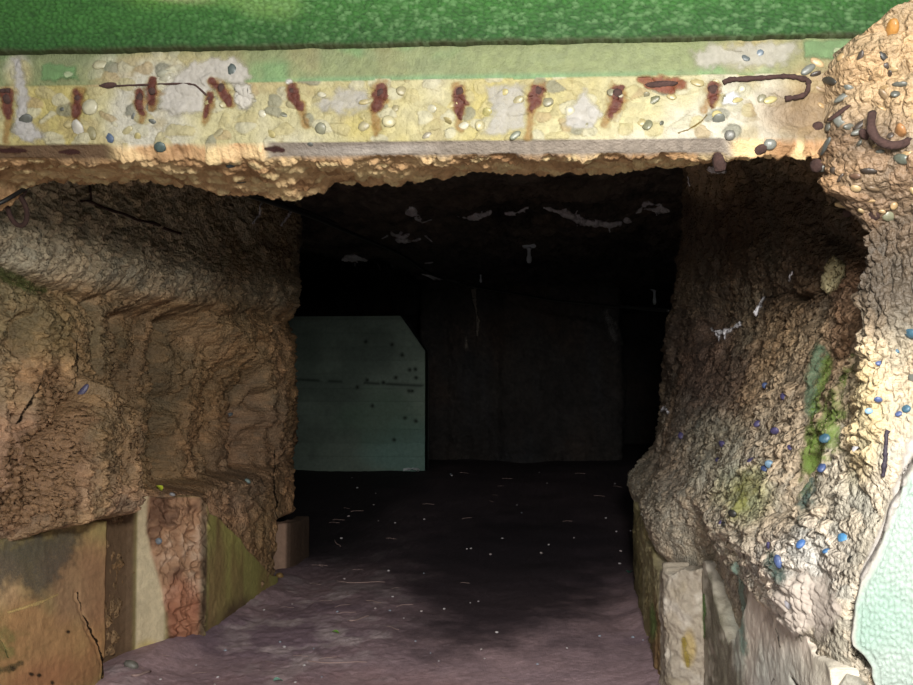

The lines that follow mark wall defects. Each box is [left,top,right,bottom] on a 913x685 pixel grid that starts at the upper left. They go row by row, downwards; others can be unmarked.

corrosion [133,76,160,123]
corrosion [203,77,235,124]
corrosion [287,83,309,128]
corrosion [370,83,389,136]
corrosion [452,82,469,132]
corrosion [601,85,627,126]
corrosion [636,75,687,94]
efflorescence [457,210,492,221]
efflorescence [543,201,670,232]
leakage [798,355,831,509]
leakage [765,551,785,585]
crack [77,592,104,679]